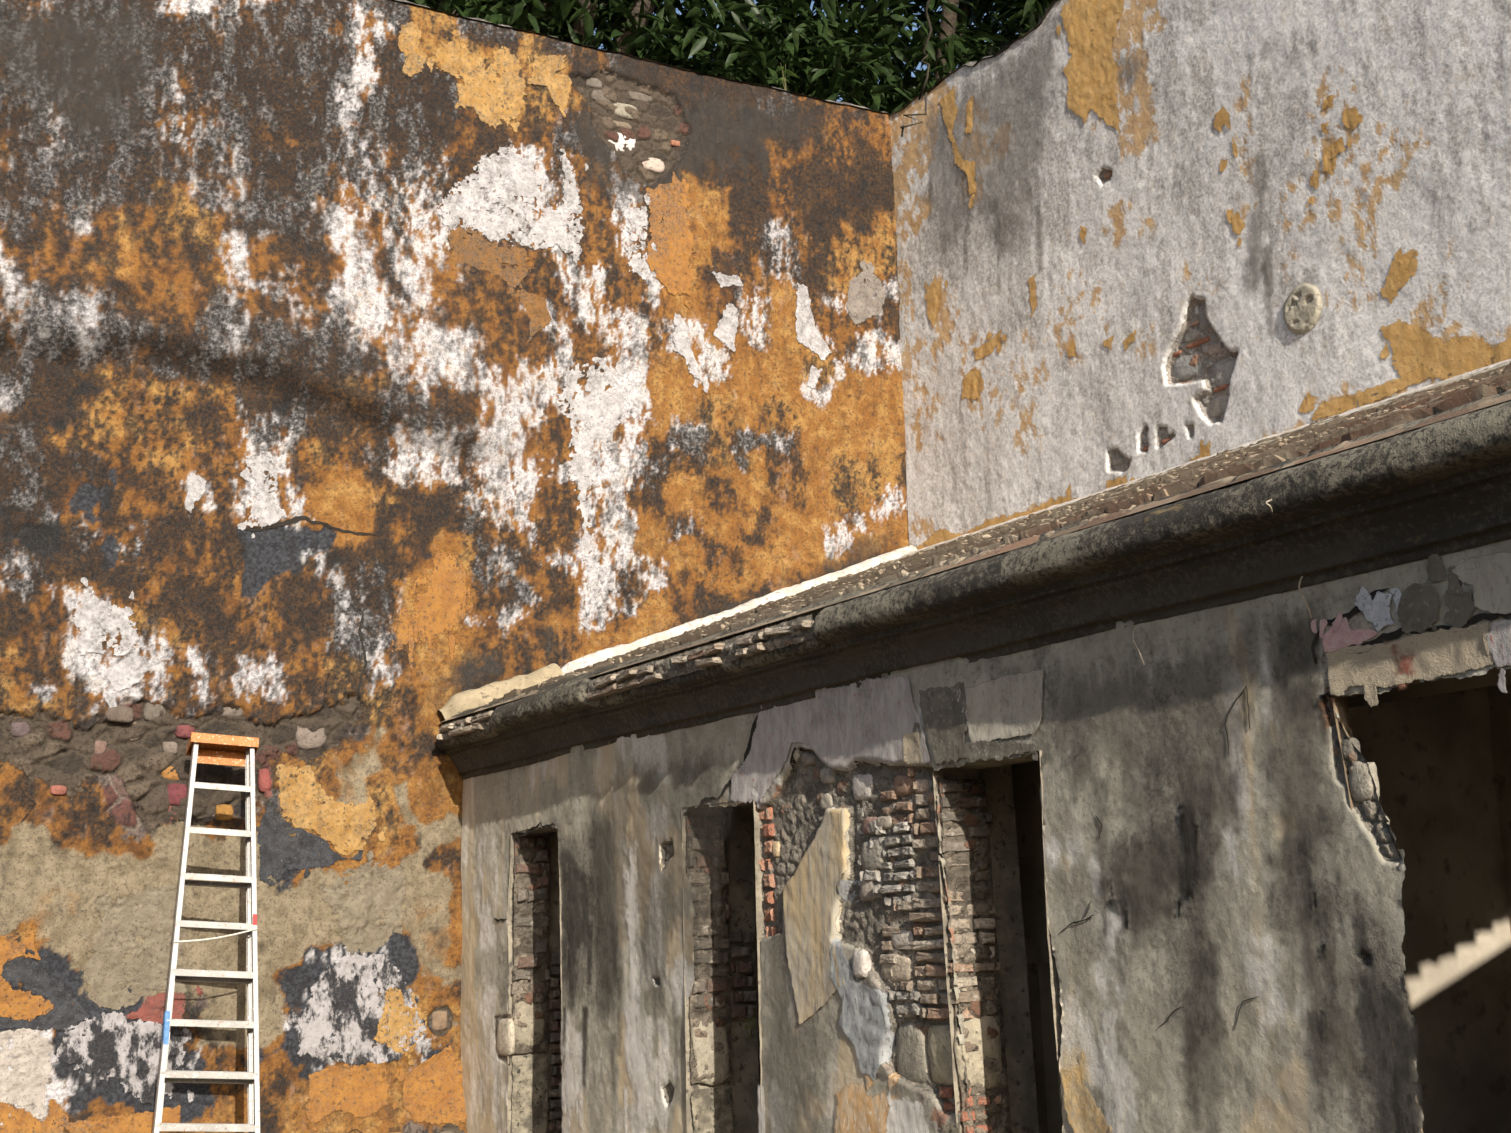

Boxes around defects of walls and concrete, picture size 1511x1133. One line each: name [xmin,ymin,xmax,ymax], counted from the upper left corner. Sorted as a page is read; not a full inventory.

peeling [398,21,709,393]
peeling [712,271,743,351]
peeling [795,283,832,389]
flaking render [1103,298,1238,489]
peeling [1299,247,1511,421]
crack [244,516,377,536]
flaking render [0,577,467,1133]
crack [699,714,758,807]
flaking render [661,669,1047,1133]
peeling [1311,552,1511,862]
water stain [1099,909,1127,1133]
water stain [1354,897,1421,1133]